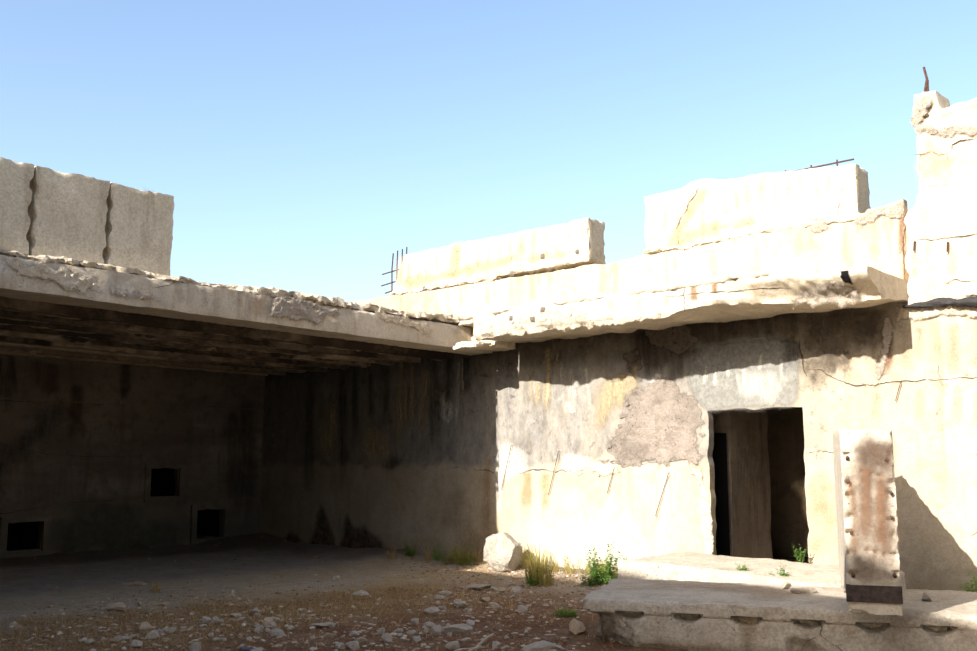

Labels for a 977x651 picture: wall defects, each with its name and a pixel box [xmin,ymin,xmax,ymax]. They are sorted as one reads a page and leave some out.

spalling [910,67,977,137]
spalling [4,255,99,294]
spalling [791,270,862,308]
damp [601,331,694,421]
crack [799,340,977,387]
peeling [590,377,713,554]